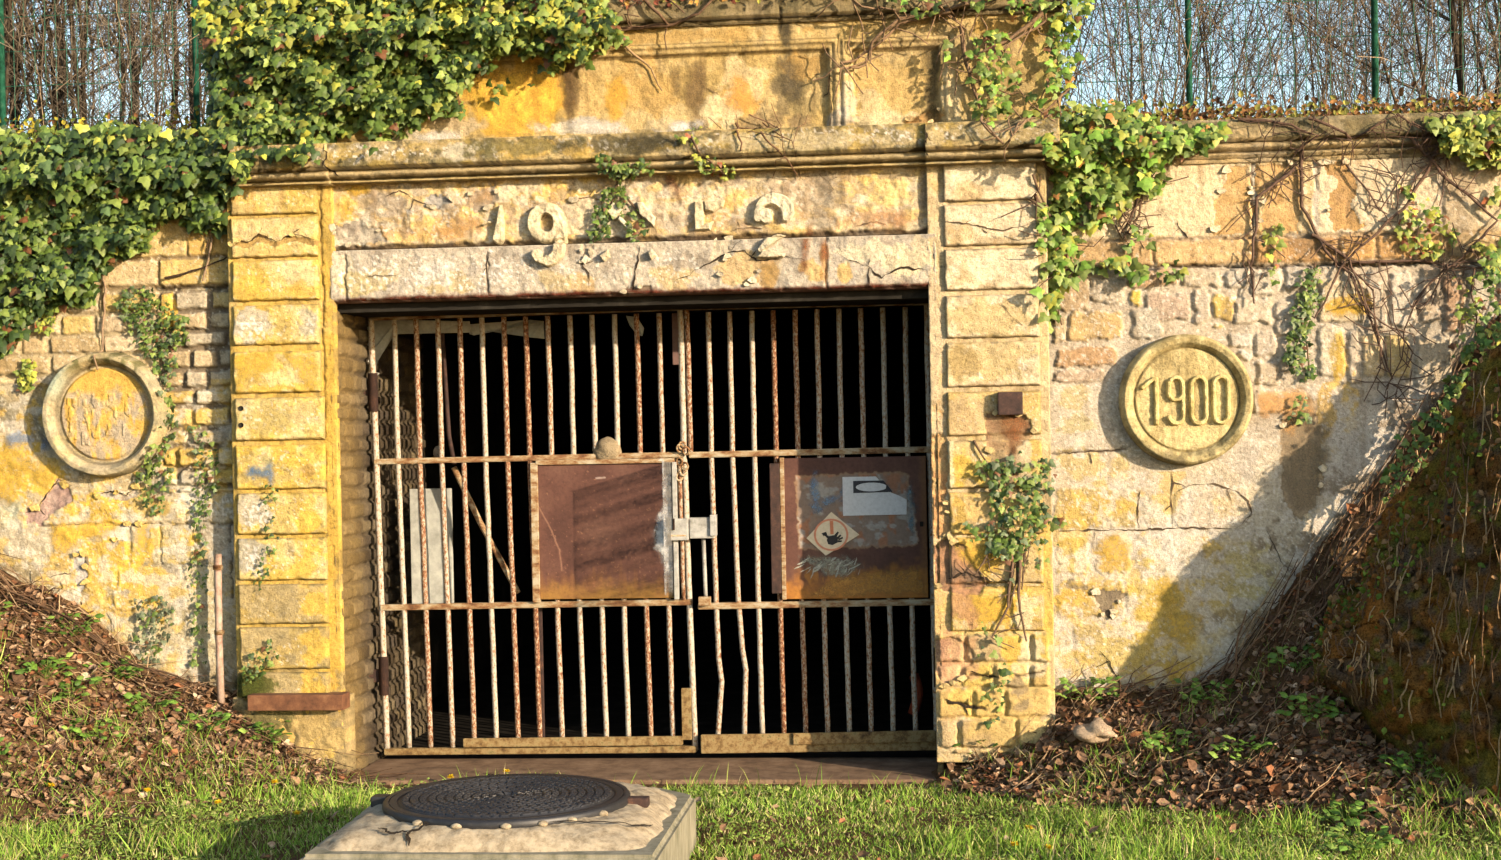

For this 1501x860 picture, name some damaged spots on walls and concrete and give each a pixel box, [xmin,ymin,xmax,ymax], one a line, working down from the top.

damp [418,132,460,140]
damp [531,63,703,154]
damp [778,23,803,101]
damp [925,51,938,121]
spalling [423,184,499,213]
flaking render [1210,159,1308,237]
flaking render [1317,157,1366,231]
crack [241,229,318,243]
crack [632,246,640,291]
damp [1284,423,1328,509]
spalling [26,478,73,525]